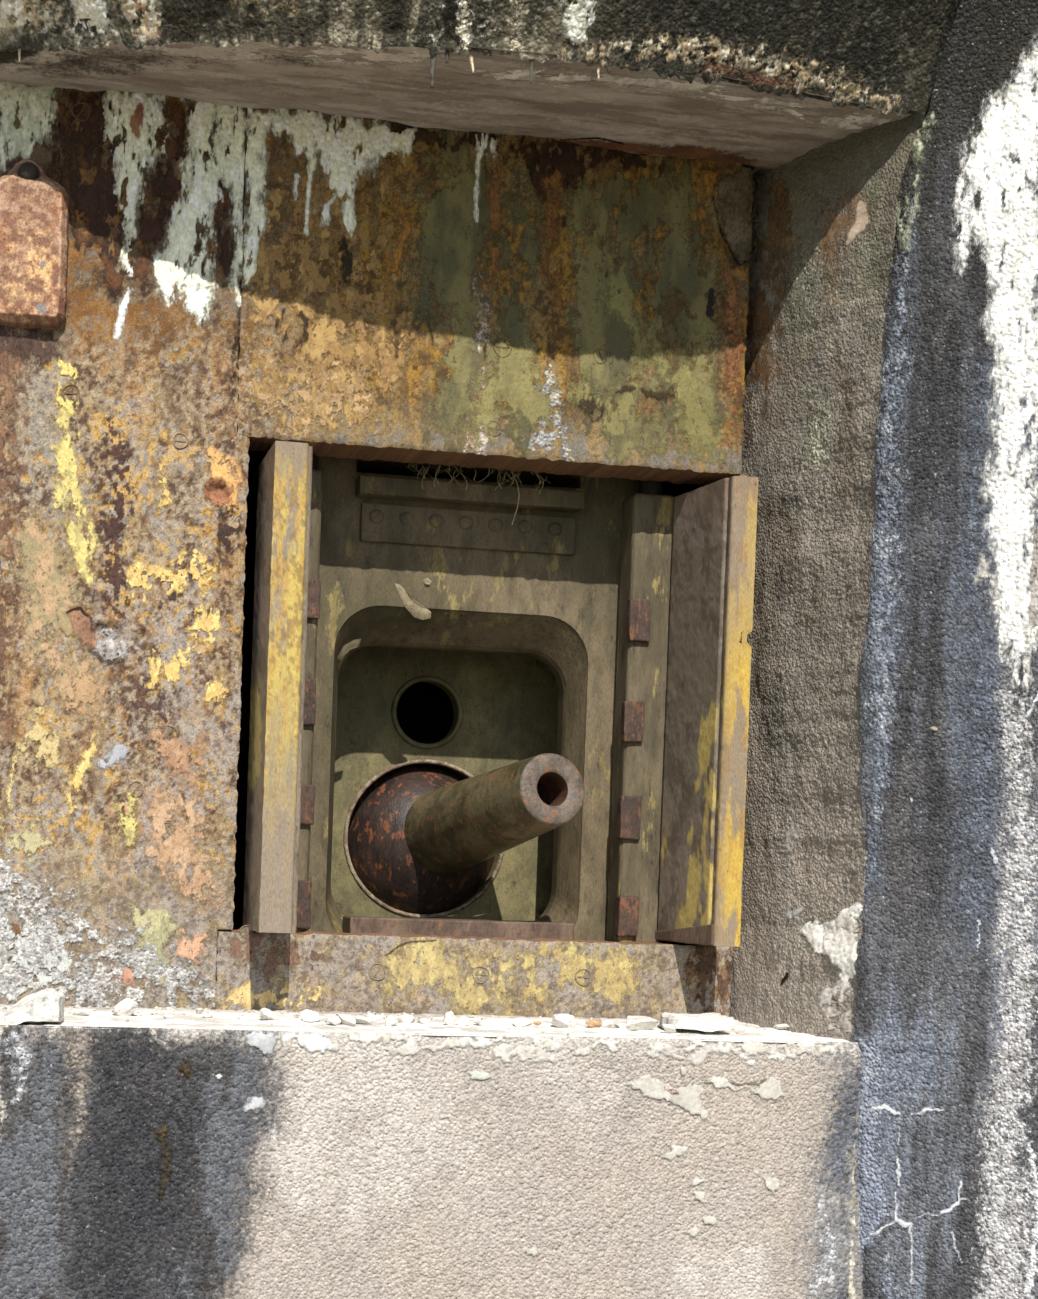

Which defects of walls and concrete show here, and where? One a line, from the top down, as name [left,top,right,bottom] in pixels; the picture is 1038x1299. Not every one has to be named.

rust [46,91,187,300]
leakage [0,0,417,339]
rust [213,181,242,397]
rust [88,412,137,621]
peeling [126,545,221,689]
peeling [204,446,243,519]
leakage [859,113,934,902]
leakage [947,46,1038,1299]
peeling [222,978,330,1010]
peeling [244,902,863,1120]
leakage [0,1025,283,1299]
crack [866,1104,966,1284]